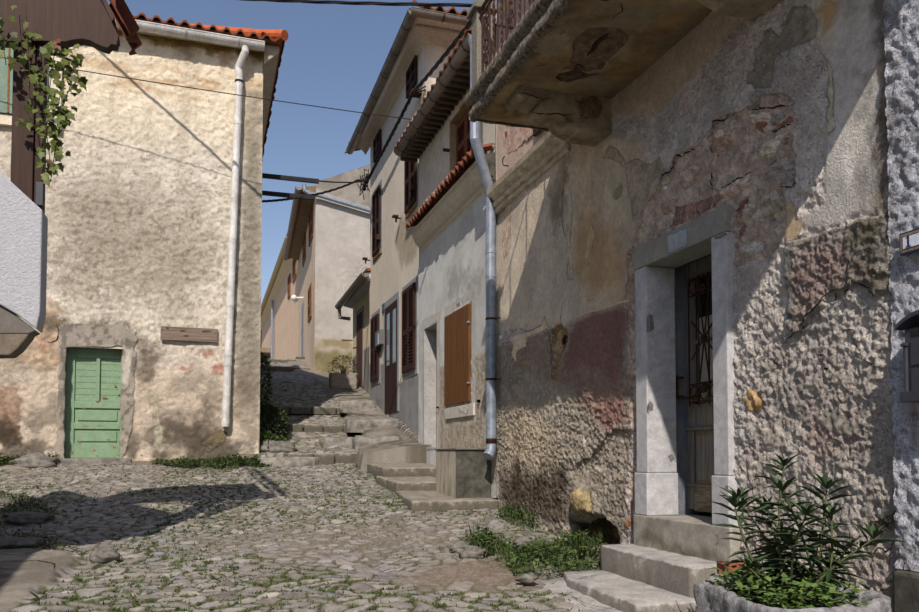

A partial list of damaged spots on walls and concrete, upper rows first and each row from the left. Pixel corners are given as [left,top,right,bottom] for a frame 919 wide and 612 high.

spalling [556,27,627,80]
crack [604,10,795,215]
spalling [511,317,569,381]
spalling [603,6,817,529]
crack [756,258,873,370]
damp [0,421,20,446]
crack [576,429,622,528]